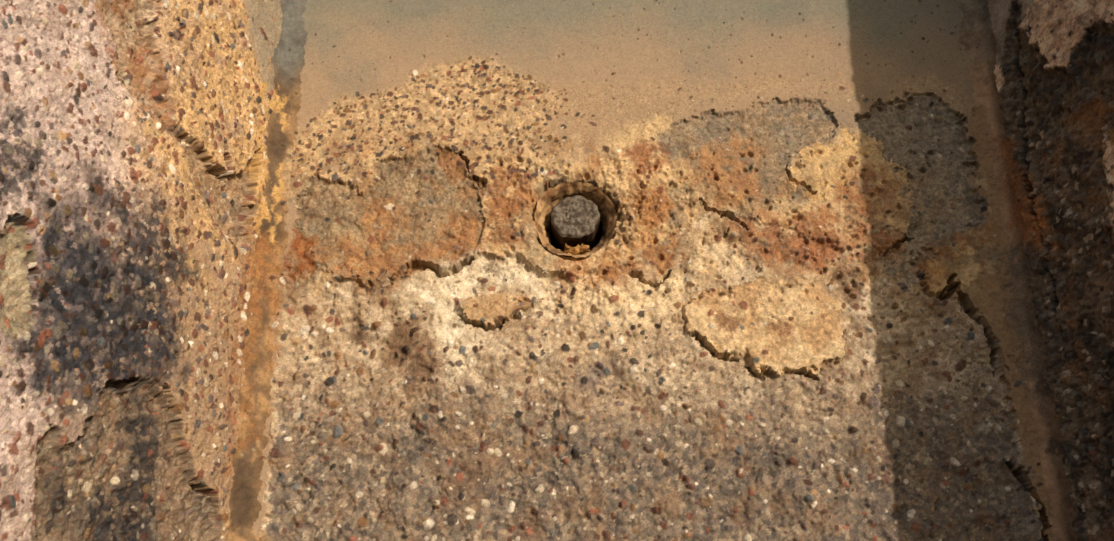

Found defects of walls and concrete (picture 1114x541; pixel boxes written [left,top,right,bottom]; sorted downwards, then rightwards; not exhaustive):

spalling [97,0,259,252]
rust [218,144,539,489]
spalling [257,89,1045,541]
crack [936,273,1002,377]
spalling [998,0,1114,541]
spalling [29,372,225,541]
crack [1003,458,1053,541]